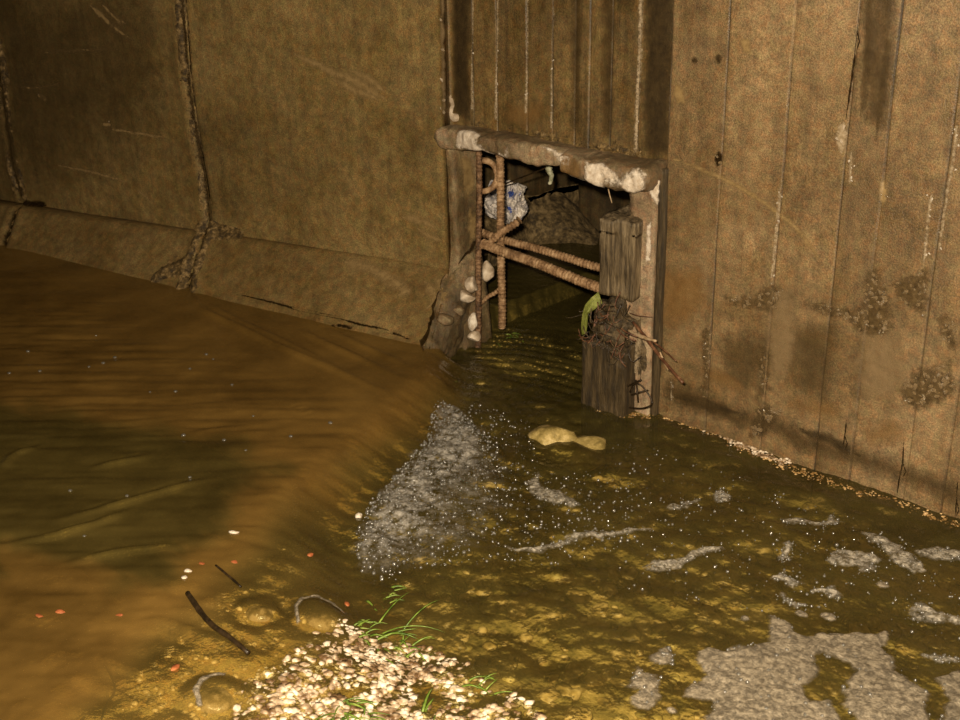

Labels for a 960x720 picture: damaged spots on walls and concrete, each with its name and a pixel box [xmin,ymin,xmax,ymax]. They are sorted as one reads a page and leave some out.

leakage [862,0,891,129]
crack [0,39,46,245]
crack [174,0,244,293]
corrosion [561,159,579,178]
peeling [526,128,660,204]
spalling [419,210,476,361]
leakage [669,382,960,497]